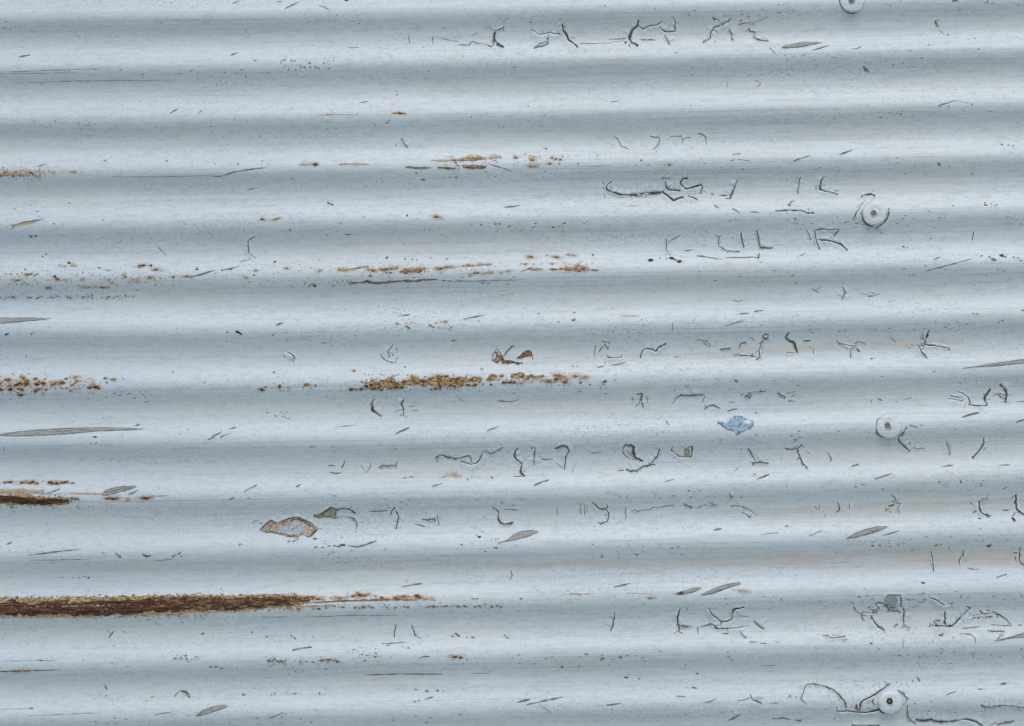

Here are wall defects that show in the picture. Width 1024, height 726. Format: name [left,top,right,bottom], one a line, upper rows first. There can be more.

crack [530,13,775,53]
crack [602,153,749,207]
crack [708,175,894,259]
corrosion [243,254,599,287]
corrosion [0,373,124,400]
corrosion [349,365,591,394]
peeling [717,413,754,435]
corrosion [0,479,167,508]
peeling [259,503,345,548]
corrosion [0,592,503,627]
crack [823,550,1011,648]
crack [727,678,1024,726]